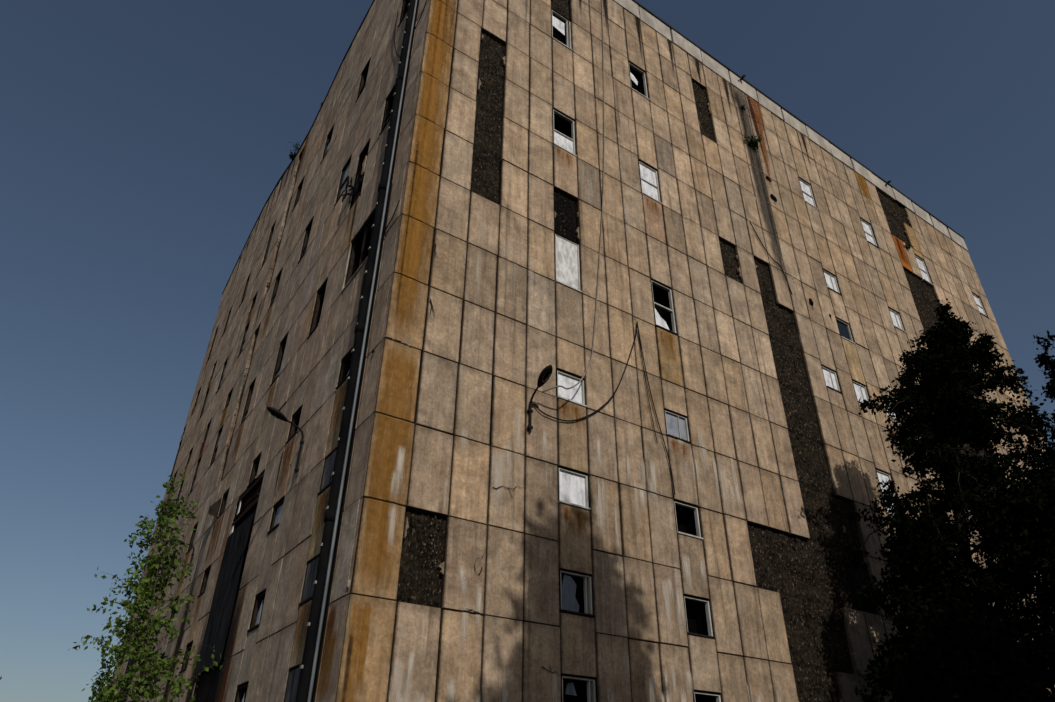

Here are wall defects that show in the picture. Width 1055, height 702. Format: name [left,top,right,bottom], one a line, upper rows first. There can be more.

corrosion [397,0,454,321]
peeling [470,32,505,205]
corrosion [747,96,770,175]
peeling [719,240,742,283]
corrosion [895,237,908,263]
peeling [903,269,944,350]
corrosion [365,354,414,577]
peeling [747,259,878,702]
peeling [396,509,446,608]